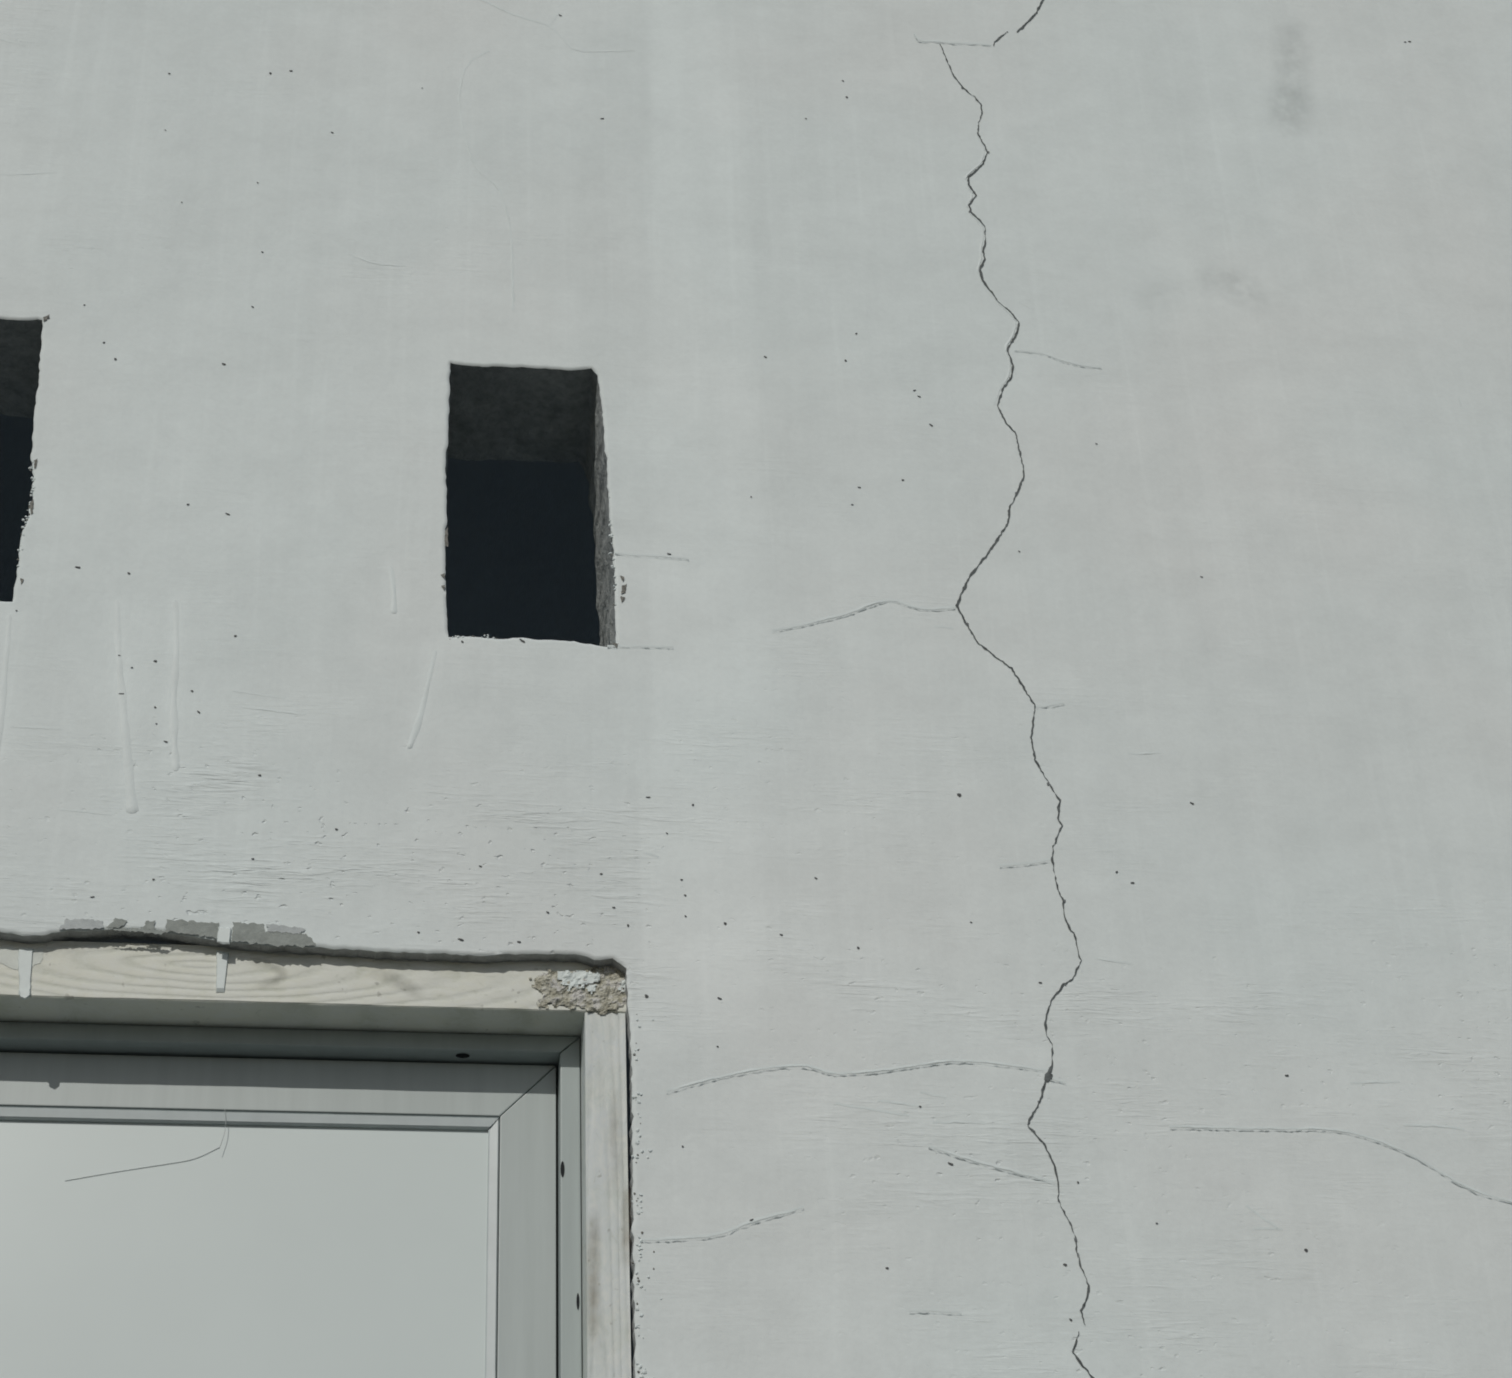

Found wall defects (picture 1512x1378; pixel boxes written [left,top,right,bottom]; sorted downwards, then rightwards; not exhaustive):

crack [666,0,1102,1378]
peeling [59,918,316,948]
flaking render [529,965,654,1061]
crack [1169,1125,1512,1204]
crack [641,1206,804,1243]